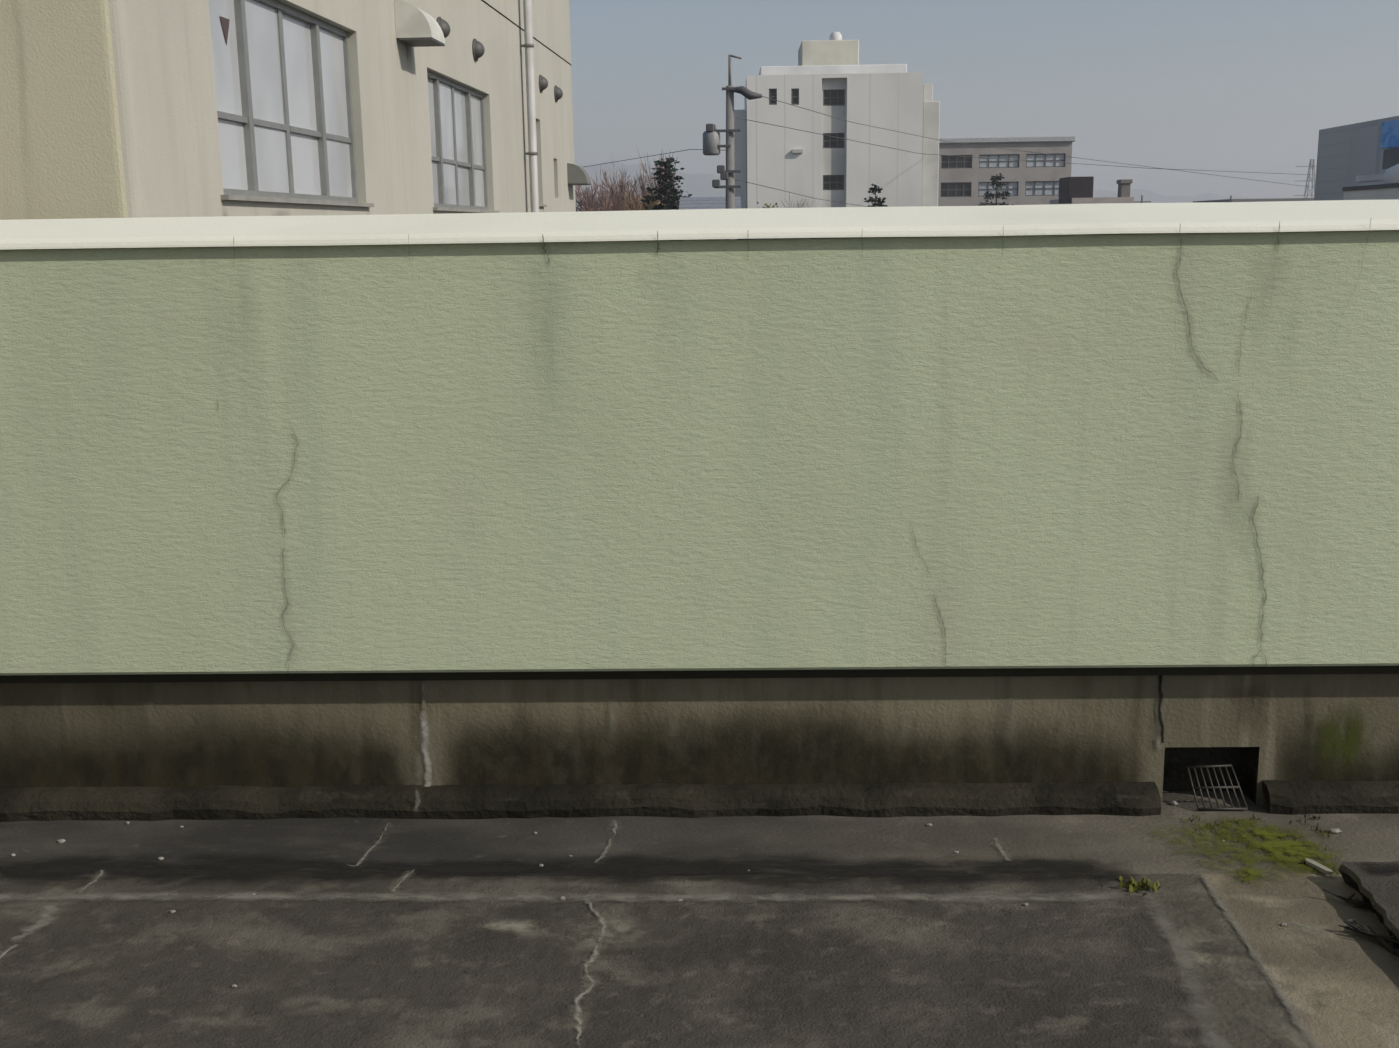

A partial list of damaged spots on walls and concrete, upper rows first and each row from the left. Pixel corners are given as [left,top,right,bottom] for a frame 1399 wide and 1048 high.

crack [1232,404,1267,657]
leakage [415,683,433,808]
crack [0,907,53,958]
crack [575,903,607,1043]